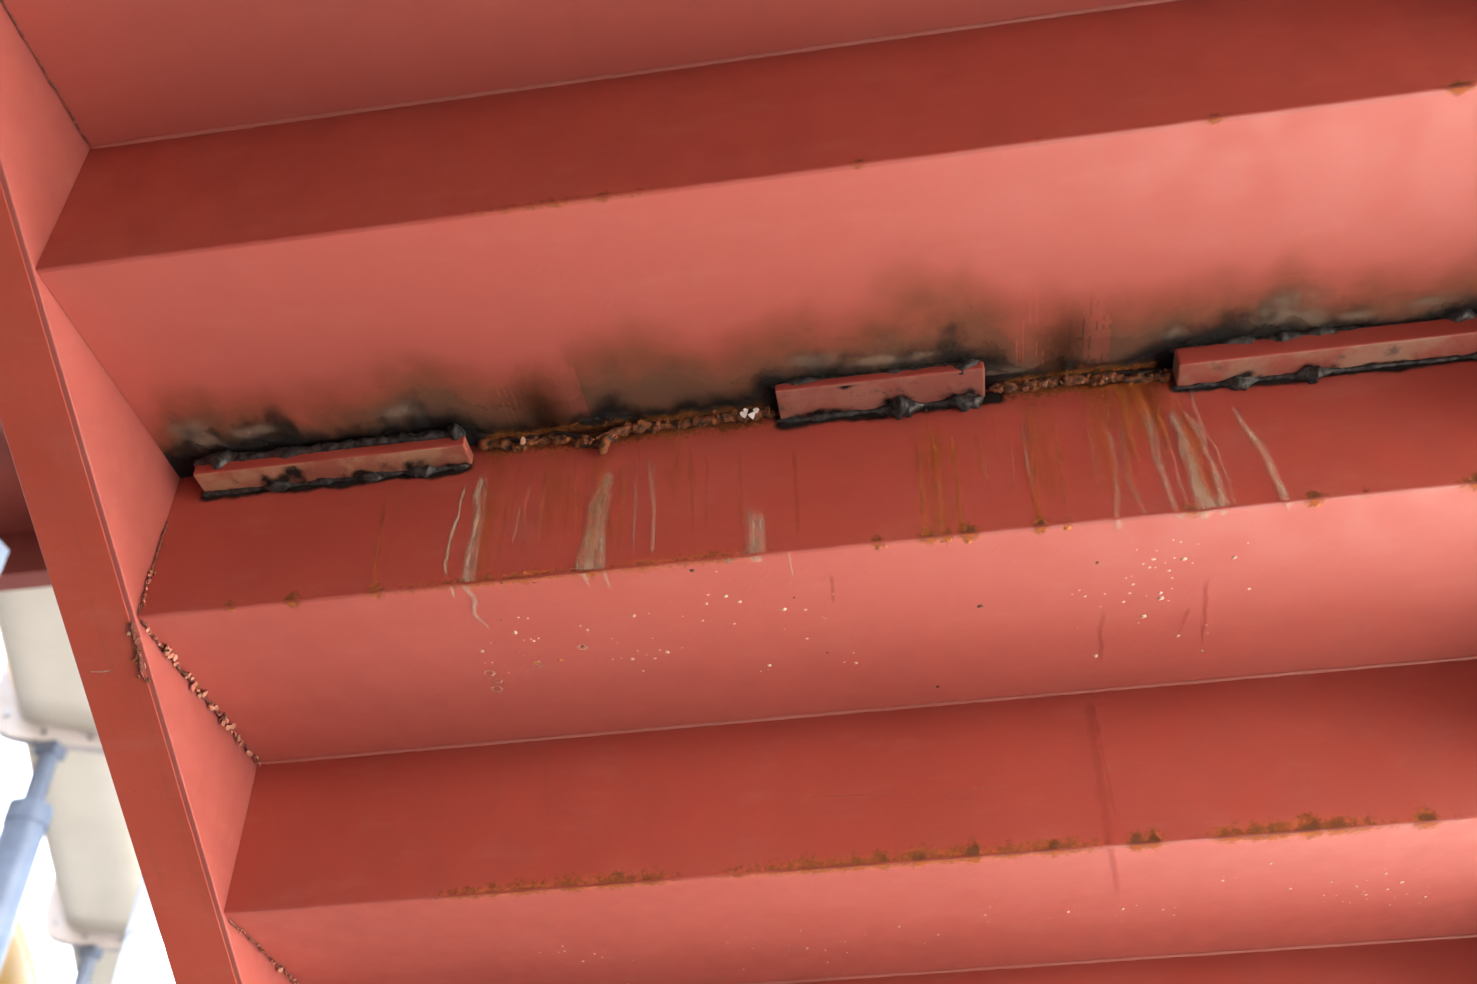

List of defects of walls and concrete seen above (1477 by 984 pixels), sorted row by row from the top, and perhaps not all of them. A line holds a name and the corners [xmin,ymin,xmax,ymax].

corrosion [920,445,980,543]
corrosion [1306,491,1325,507]
leakage [444,480,482,582]
peeling [127,620,261,767]
corrosion [1127,829,1164,851]
corrosion [1216,814,1376,844]
corrosion [1397,808,1440,828]
corrosion [734,838,1092,878]
corrosion [439,872,663,899]